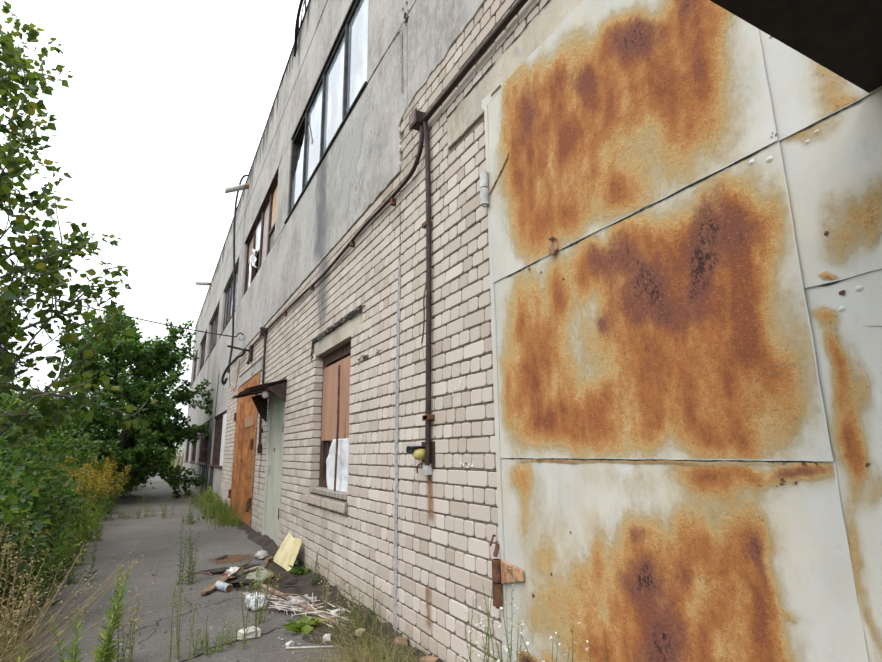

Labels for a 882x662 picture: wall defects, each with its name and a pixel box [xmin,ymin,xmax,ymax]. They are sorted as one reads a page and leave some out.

rust [498,0,882,662]